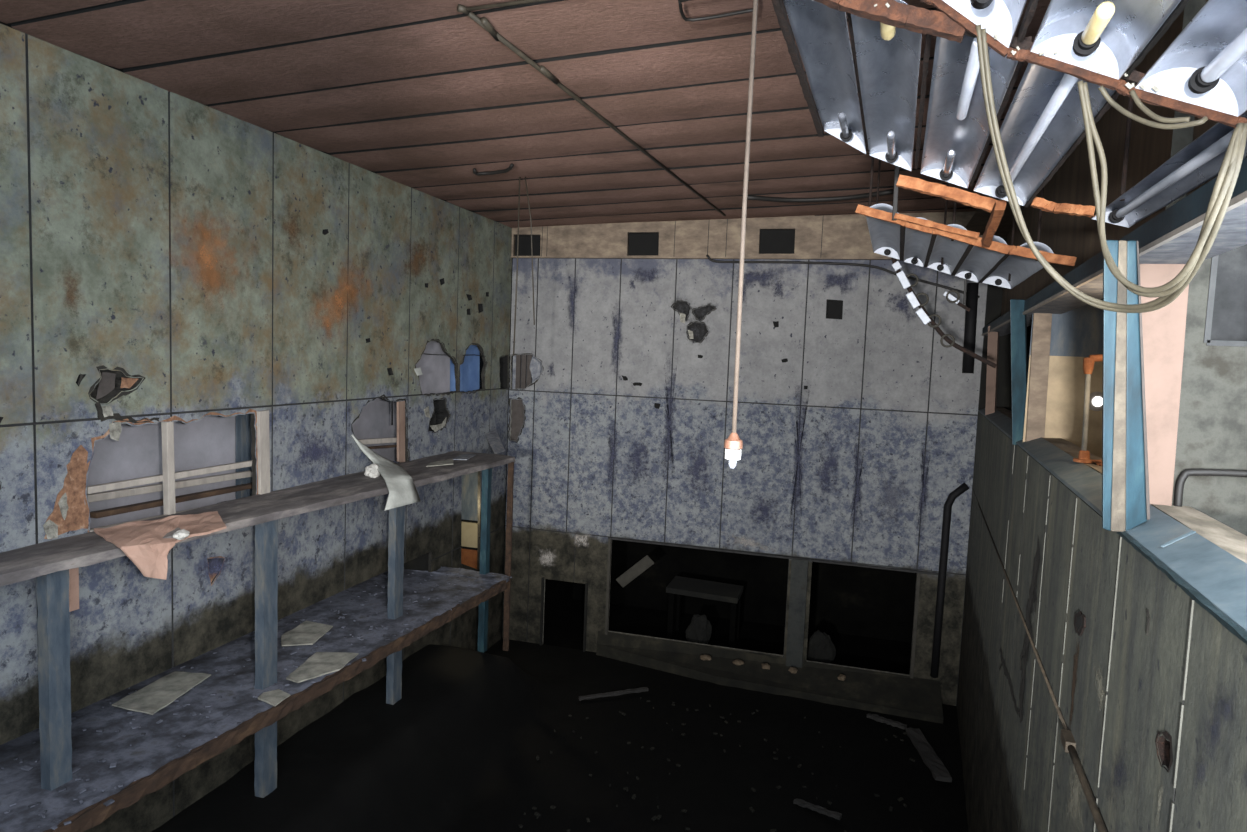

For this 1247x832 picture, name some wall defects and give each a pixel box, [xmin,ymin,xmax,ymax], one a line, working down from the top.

leakage [569,281,577,327]
leakage [612,317,622,373]
spalling [671,298,717,358]
peeling [43,365,258,539]
spalling [351,394,410,463]
spalling [414,339,544,443]
leakage [608,431,649,486]
leakage [664,376,675,468]
leakage [792,402,806,507]
leakage [852,445,863,525]
leakage [918,443,929,521]
spalling [1155,731,1173,773]